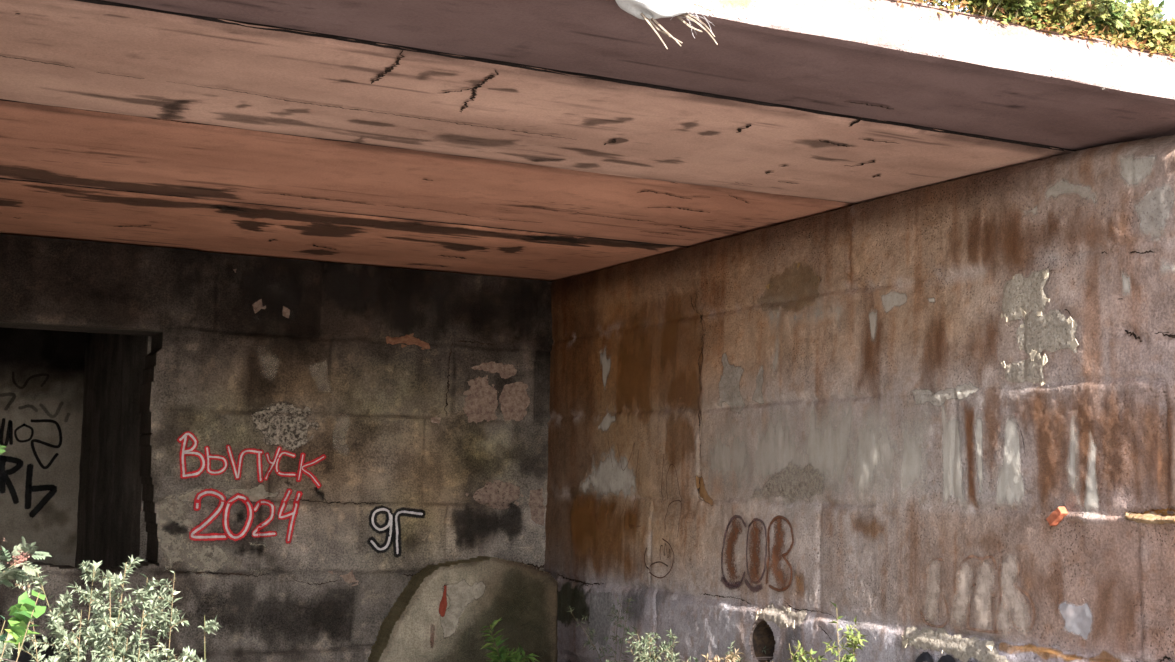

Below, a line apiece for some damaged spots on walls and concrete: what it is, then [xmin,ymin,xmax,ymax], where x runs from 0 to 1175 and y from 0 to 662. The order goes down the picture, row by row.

crack [174,50,576,140]
spalling [463,361,530,424]